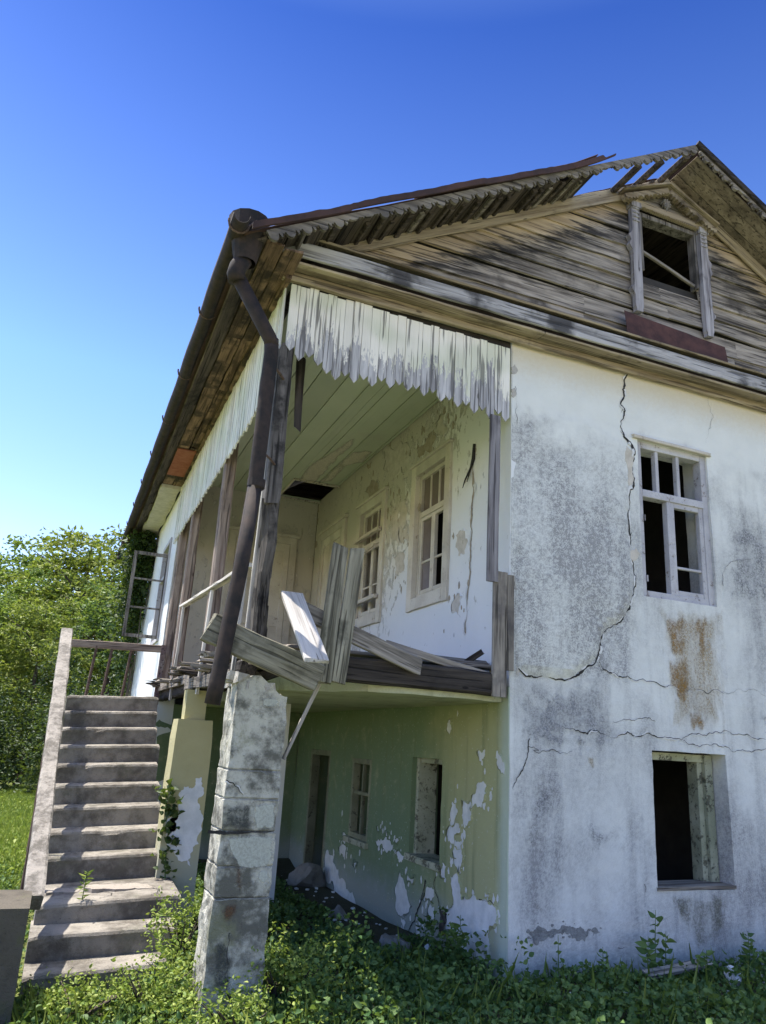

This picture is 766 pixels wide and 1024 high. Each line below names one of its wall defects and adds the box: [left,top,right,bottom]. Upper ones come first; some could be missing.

peeling [361,400,457,593]
crack [462,444,477,635]
crack [518,374,757,694]
peeling [448,580,469,617]
crack [512,717,765,789]
peeling [166,777,204,866]
peeling [324,831,364,904]
peeling [375,749,506,971]
flaking render [526,921,602,945]